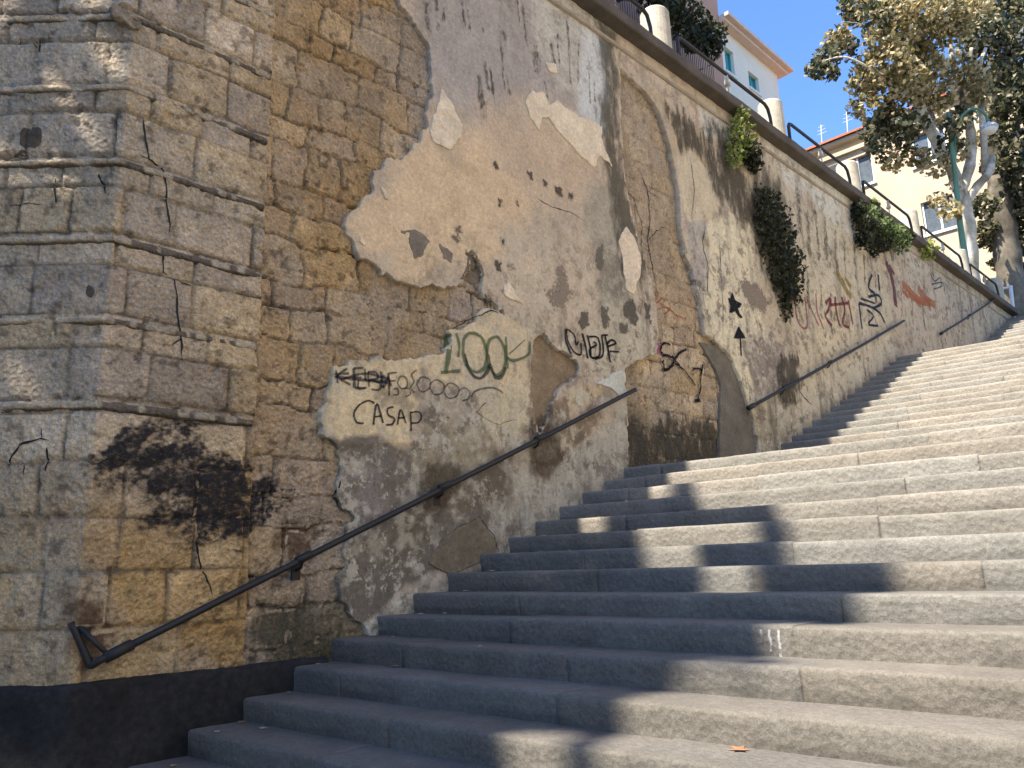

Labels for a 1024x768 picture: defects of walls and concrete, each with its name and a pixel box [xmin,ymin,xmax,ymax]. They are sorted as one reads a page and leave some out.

damp [478,31,512,108]
crack [140,116,190,364]
flaking render [525,75,719,467]
crack [630,172,669,293]
flaking render [242,0,516,665]
crack [7,429,50,476]
damp [626,412,719,467]
crack [195,541,213,597]